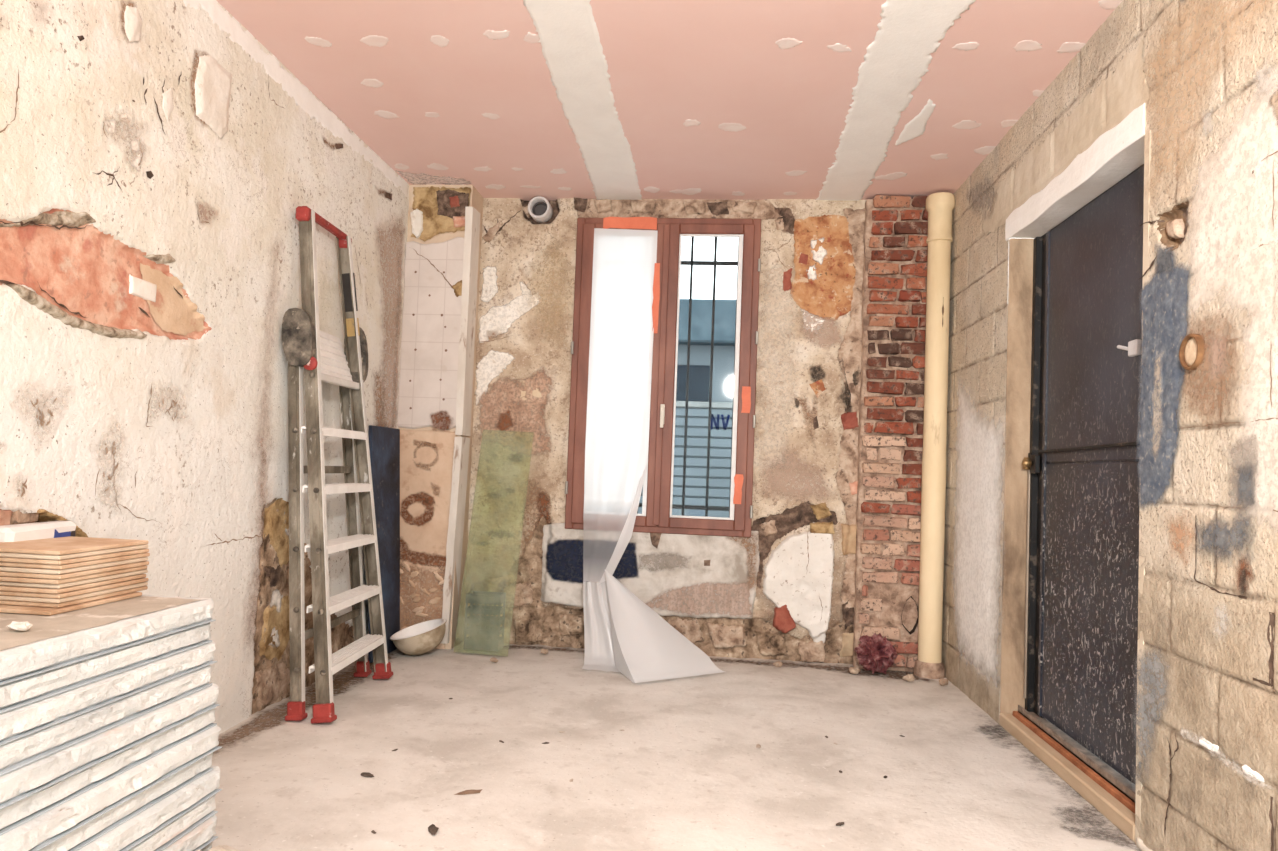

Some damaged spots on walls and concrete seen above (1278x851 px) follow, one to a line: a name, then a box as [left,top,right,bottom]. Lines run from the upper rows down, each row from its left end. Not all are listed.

peeling [121,3,142,42]
peeling [191,52,233,138]
spalling [0,208,212,340]
spalling [475,267,552,456]
peeling [1138,68,1278,526]
spalling [520,198,865,664]
spalling [469,515,585,649]
crack [1164,734,1179,843]